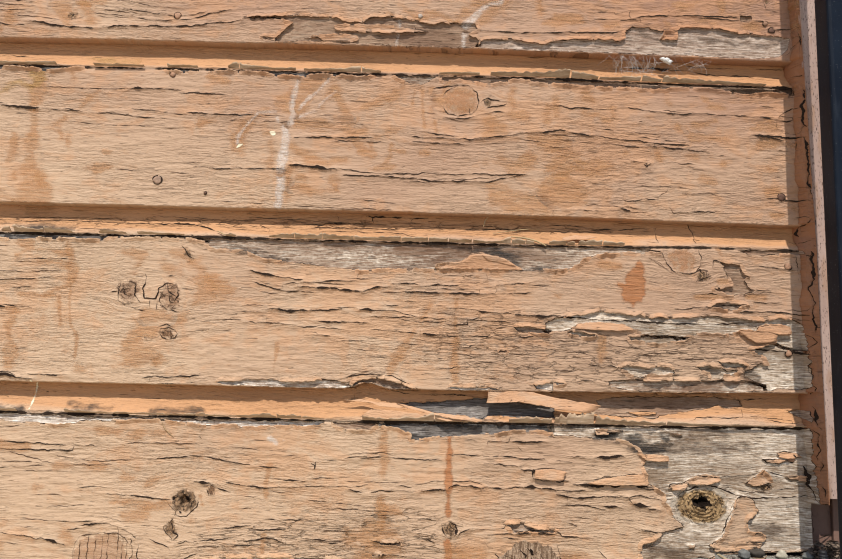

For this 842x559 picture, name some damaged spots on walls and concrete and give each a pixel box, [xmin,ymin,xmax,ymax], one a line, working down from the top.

peeling [244,12,790,59]
crack [14,199,526,237]
peeling [0,224,662,275]
crack [203,10,829,545]
peeling [0,250,821,559]
crack [1,425,677,559]